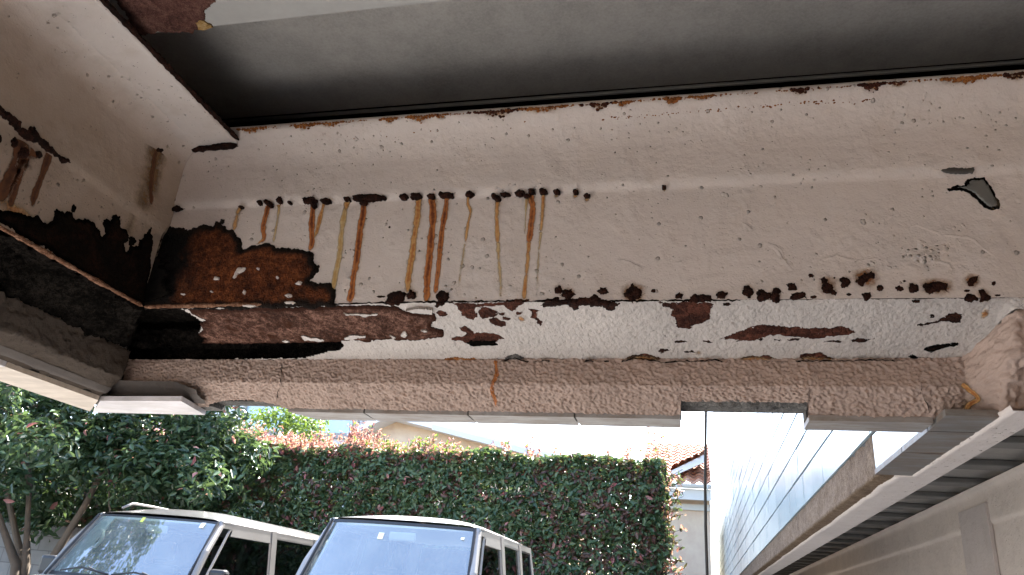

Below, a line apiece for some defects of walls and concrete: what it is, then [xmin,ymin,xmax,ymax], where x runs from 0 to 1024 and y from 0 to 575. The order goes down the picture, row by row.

rust [290,71,1024,133]
peeling [941,167,1000,210]
peeling [0,225,261,309]
spalling [129,328,339,350]
rust [0,105,475,344]
peeling [436,294,620,347]
rust [491,188,590,300]
rust [623,283,655,303]
peeling [658,294,875,354]
rust [742,270,950,303]
peeling [917,312,962,326]
rust [964,275,1000,318]